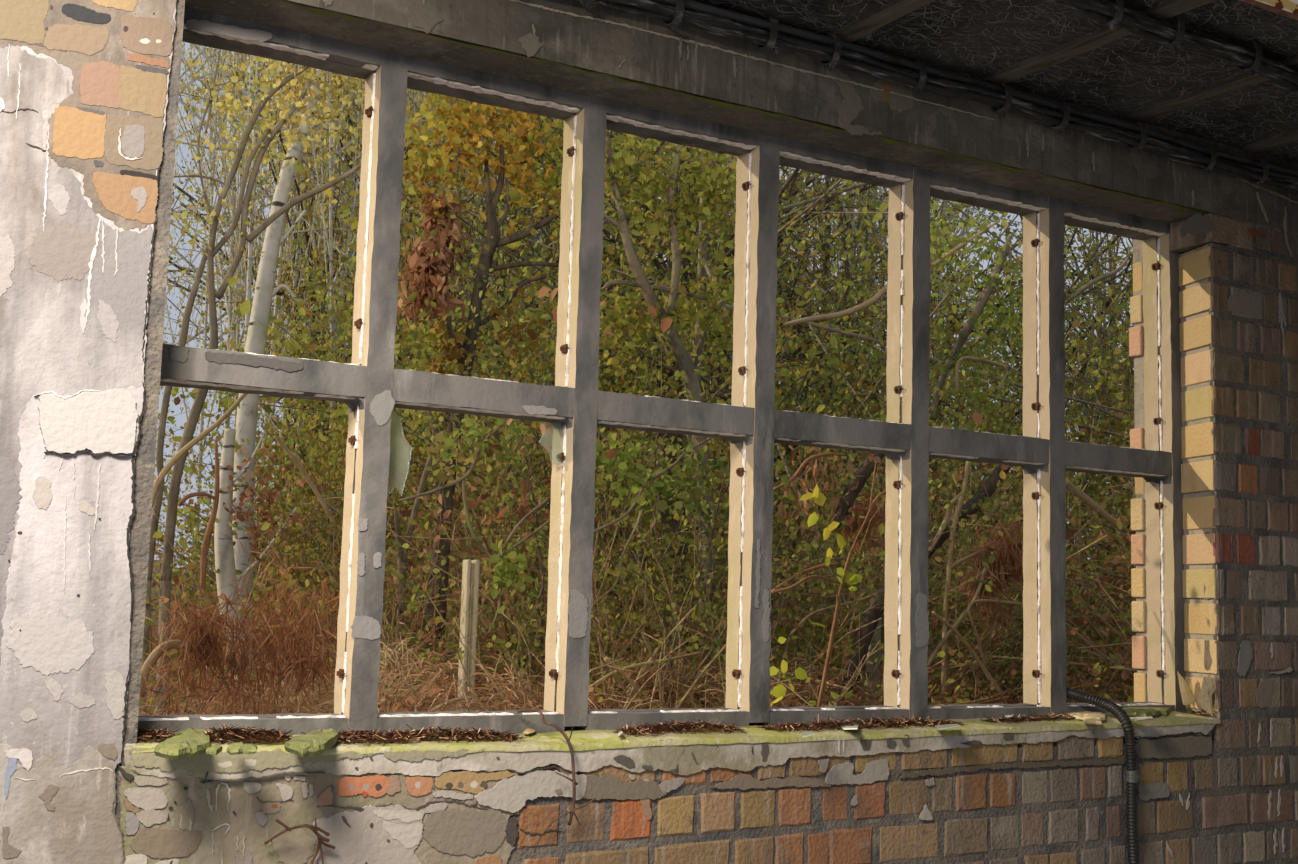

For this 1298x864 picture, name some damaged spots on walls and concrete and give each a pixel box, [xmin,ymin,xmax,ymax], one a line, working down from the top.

flaking render [0,0,273,224]
water stain [0,125,120,342]
flaking render [313,757,599,864]